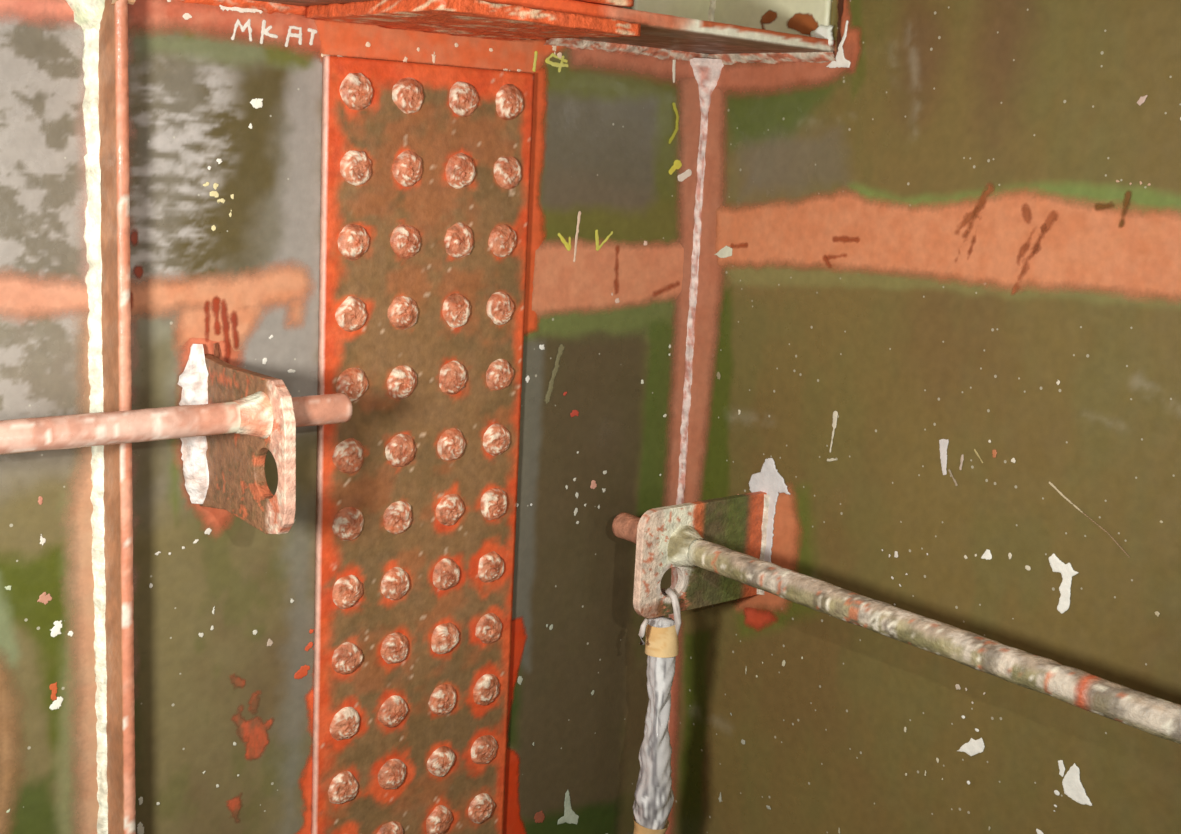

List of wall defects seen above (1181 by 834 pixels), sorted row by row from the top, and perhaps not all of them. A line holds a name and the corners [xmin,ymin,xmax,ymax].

rust [760,10,818,35]
rust [956,185,993,254]
rust [1095,191,1131,227]
rust [1012,212,1057,294]
rust [205,297,239,363]
peeling [1049,554,1078,613]
rust [231,675,273,760]
peeling [957,728,985,756]
peeling [534,790,579,824]
peeling [1054,760,1092,811]